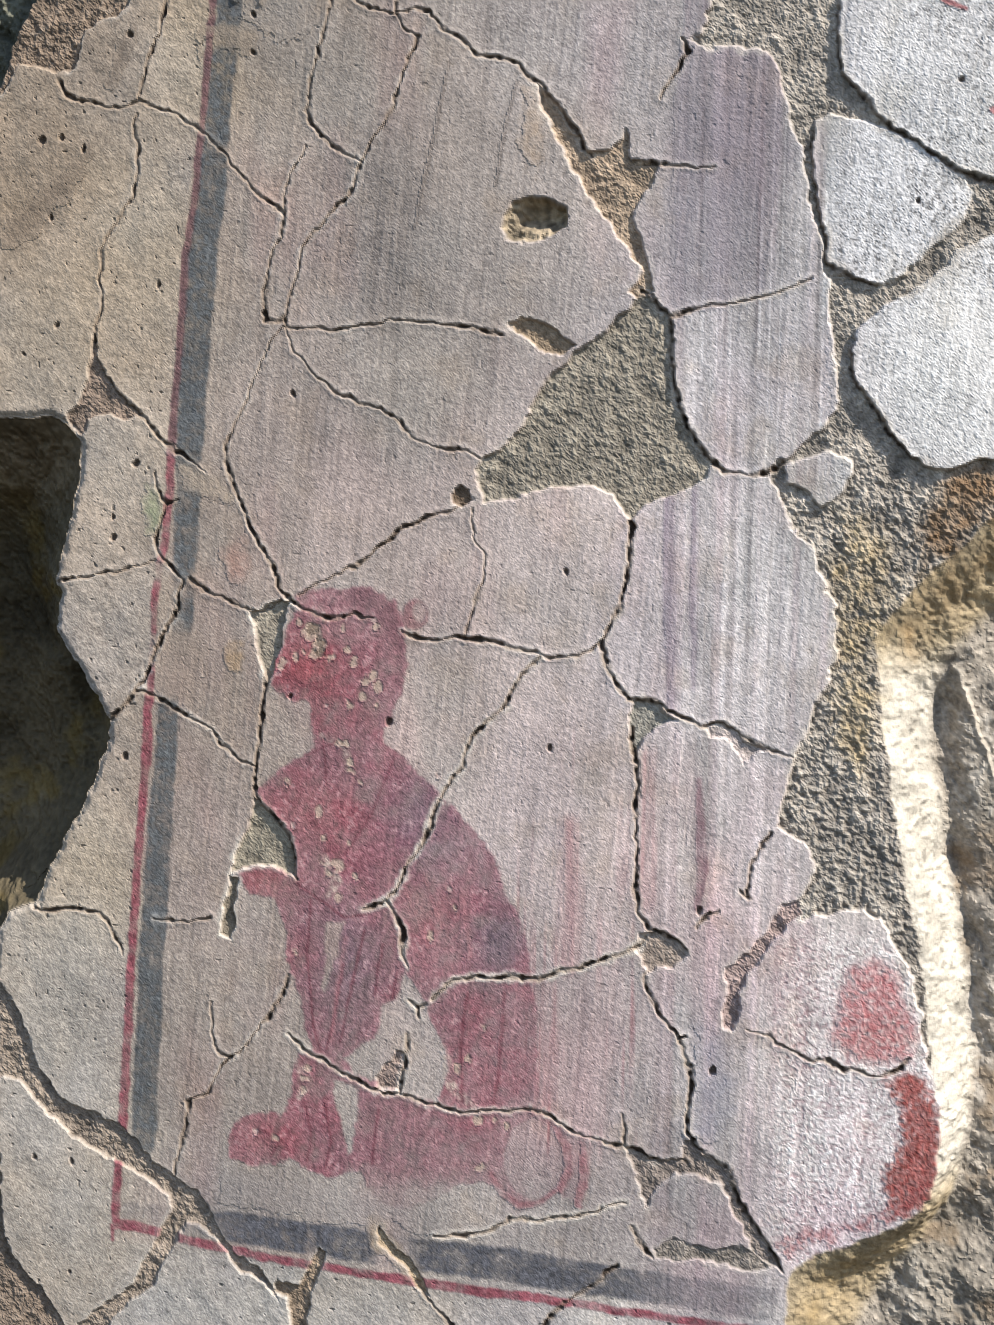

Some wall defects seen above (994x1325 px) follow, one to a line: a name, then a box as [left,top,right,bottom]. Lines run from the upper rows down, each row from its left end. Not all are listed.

spalling [0,0,130,96]
spalling [452,88,712,521]
crack [639,131,880,479]
spalling [691,0,994,623]
spalling [252,602,393,726]
crack [57,0,794,1274]
crack [33,906,124,956]
spalling [0,982,326,1325]
crack [417,1279,455,1325]
crack [433,1202,654,1325]
spalling [723,639,933,1072]
crack [746,1030,911,1080]